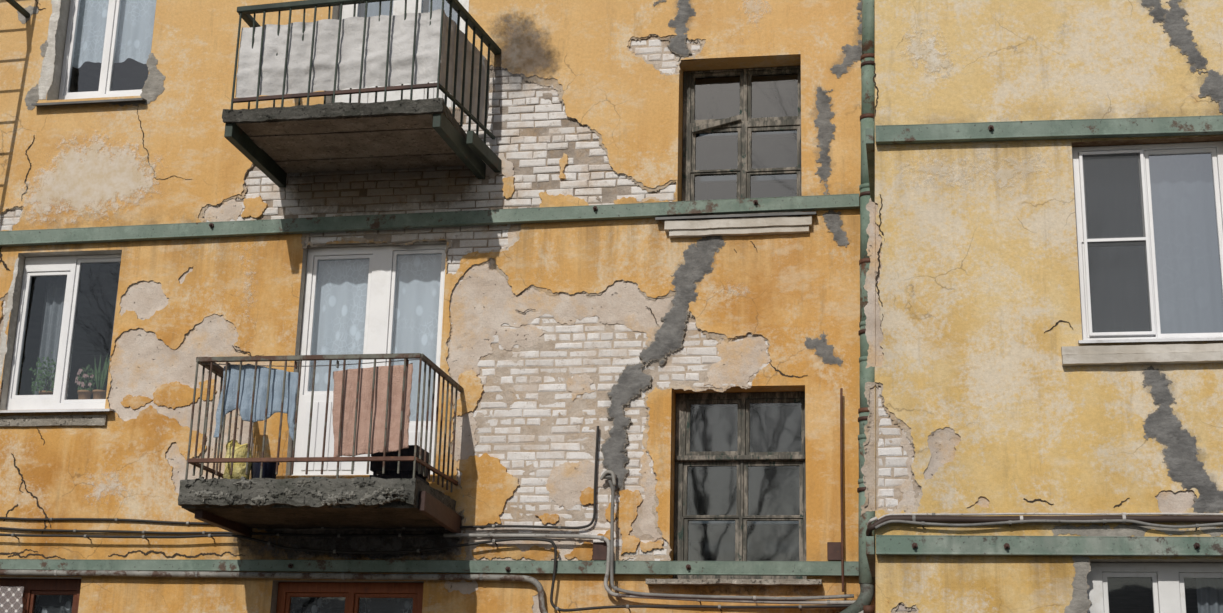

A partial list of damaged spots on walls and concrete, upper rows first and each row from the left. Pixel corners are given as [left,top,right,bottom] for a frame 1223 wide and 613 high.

flaking render [198,65,677,222]
leakage [496,18,557,86]
crack [653,0,696,60]
crack [814,0,879,247]
crack [1141,0,1223,114]
crack [0,453,65,559]
peeling [107,281,408,507]
flaking render [301,224,772,561]
crack [601,236,757,491]
flaking render [861,198,961,515]
crack [1142,365,1223,513]
flaking render [891,602,919,613]